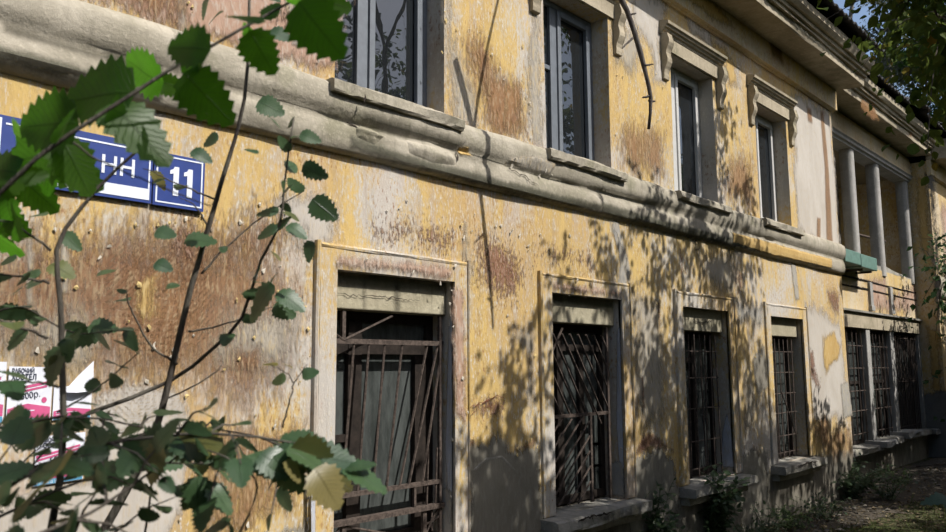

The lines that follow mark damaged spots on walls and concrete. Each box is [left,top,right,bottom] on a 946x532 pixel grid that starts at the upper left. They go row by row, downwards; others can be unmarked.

damp [352,136,761,252]
peeling [0,190,340,461]
peeling [337,199,680,532]
peeling [745,346,768,434]
peeling [805,290,851,463]
peeling [0,456,196,532]
peeling [196,467,295,532]
peeling [286,517,310,532]